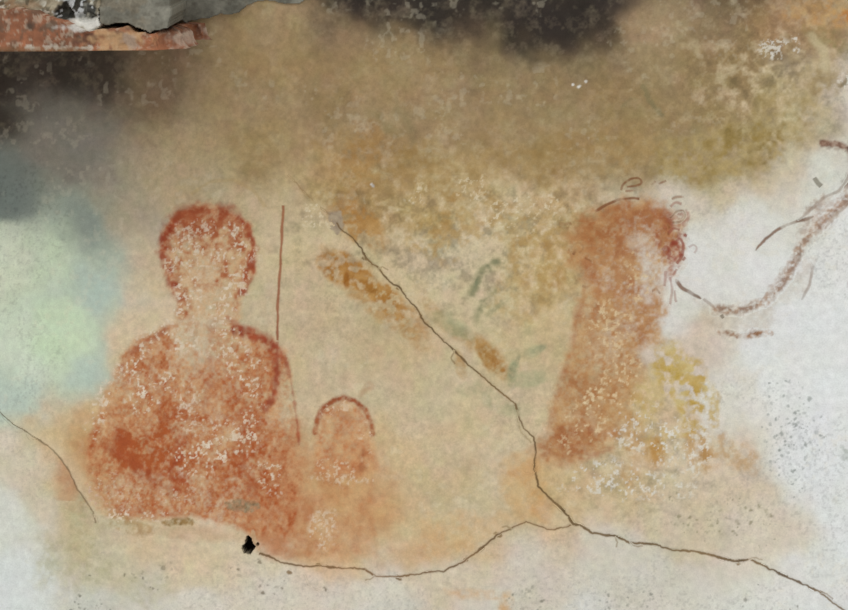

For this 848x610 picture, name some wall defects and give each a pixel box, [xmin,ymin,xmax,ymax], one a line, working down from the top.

crack [0,409,98,523]
crack [258,174,845,610]